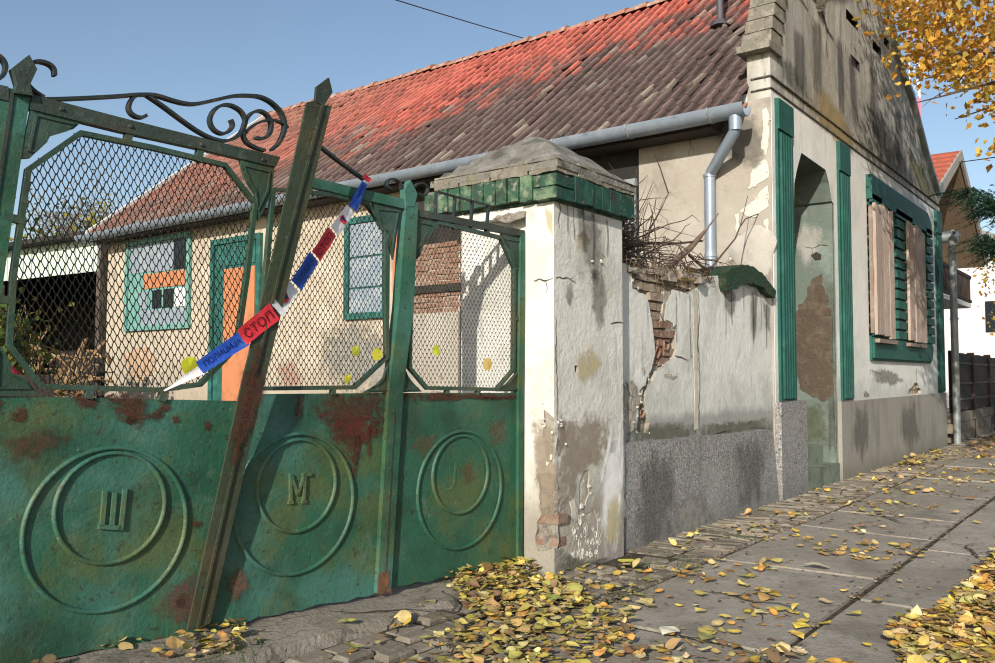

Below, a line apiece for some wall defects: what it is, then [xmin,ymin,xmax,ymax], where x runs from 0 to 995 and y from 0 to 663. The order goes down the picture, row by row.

flaking render [735,108,771,238]
water stain [577,209,606,322]
rust [231,345,264,466]
flaking render [542,410,567,466]
flaking render [623,266,698,434]
flaking render [796,273,835,402]
flaking render [537,470,602,567]